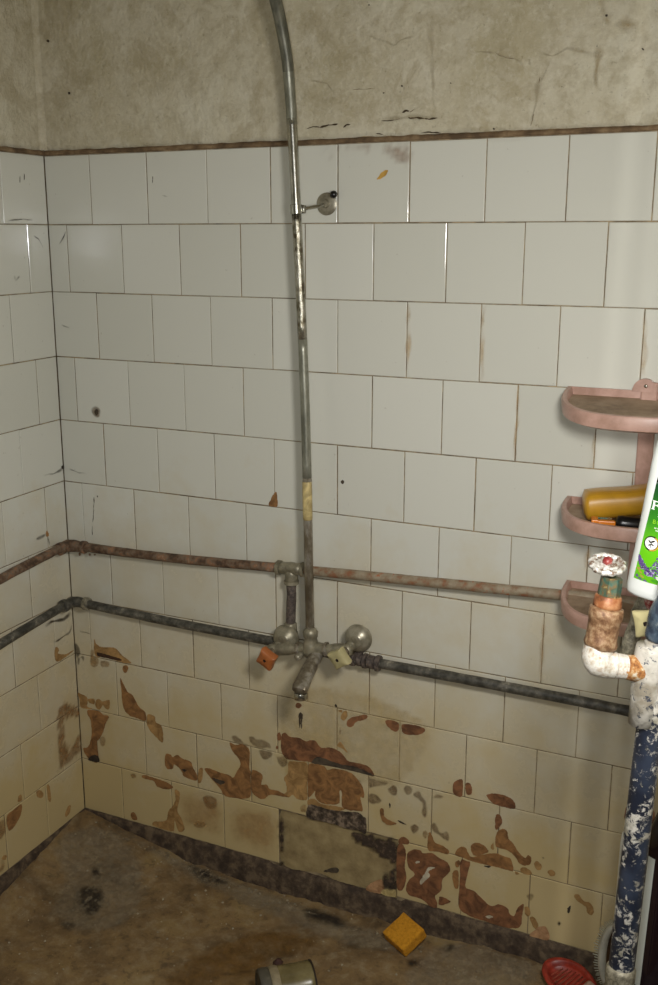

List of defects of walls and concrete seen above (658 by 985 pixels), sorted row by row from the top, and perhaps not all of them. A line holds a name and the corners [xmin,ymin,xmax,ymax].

peeling [78,693,110,763]
peeling [91,639,163,742]
peeling [335,704,368,727]
peeling [385,720,425,735]
peeling [0,794,22,837]
peeling [131,774,205,832]
peeling [165,732,555,940]